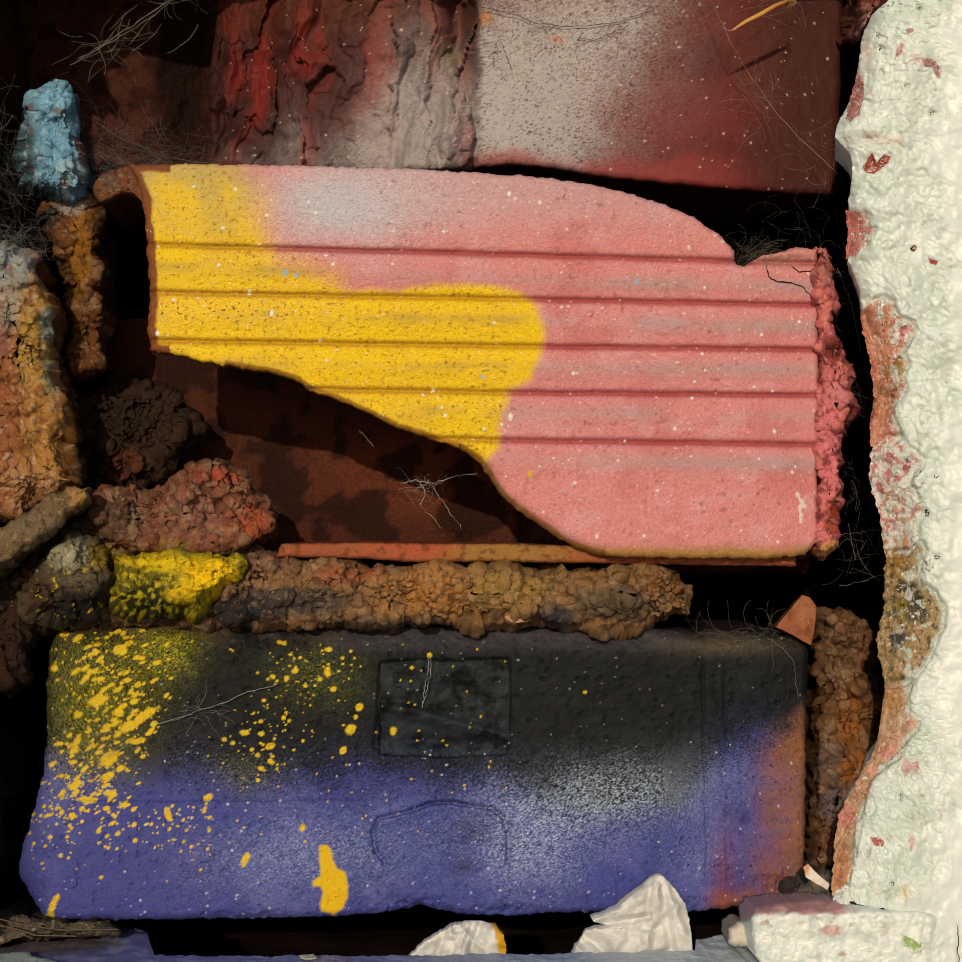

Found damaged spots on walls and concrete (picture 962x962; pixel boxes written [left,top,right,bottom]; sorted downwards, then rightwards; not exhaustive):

spalling [835,0,888,48]
peeling [895,28,914,59]
peeling [922,58,941,78]
peeling [845,69,864,121]
peeling [863,154,891,174]
peeling [845,210,877,259]
peeling [831,295,947,896]
peeling [773,595,817,645]
peeling [0,952,56,962]